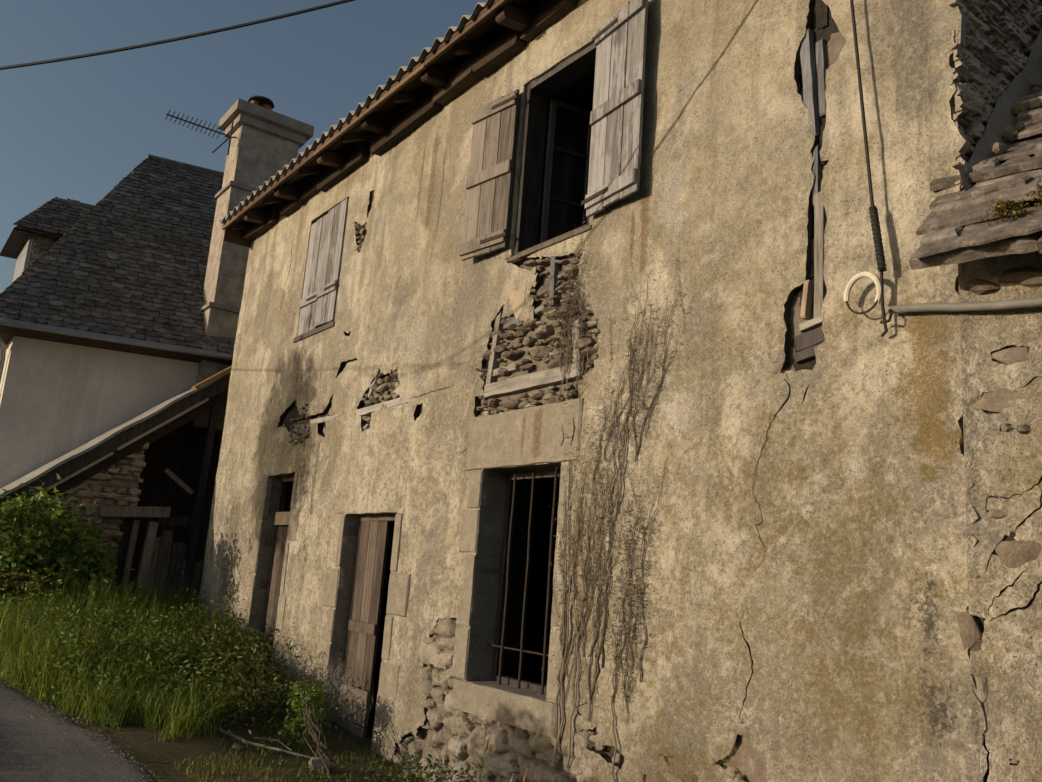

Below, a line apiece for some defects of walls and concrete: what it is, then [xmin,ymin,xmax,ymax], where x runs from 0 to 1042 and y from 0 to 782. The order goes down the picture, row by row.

flaking render [789,145,827,371]
flaking render [475,249,600,416]
flaking render [991,346,1029,365]
flaking render [355,367,422,432]
flaking render [281,401,338,454]
crack [986,478,1042,565]
flaking render [995,535,1041,568]
crack [993,574,1042,619]
flaking render [956,609,986,652]
flaking render [390,618,600,782]
flaking render [573,725,625,765]